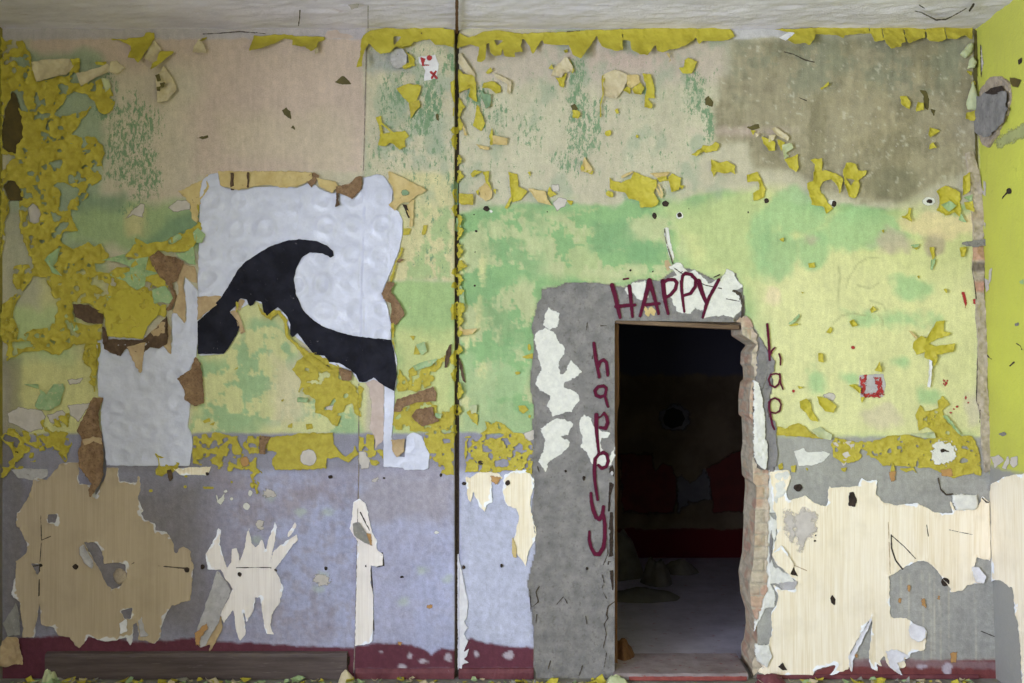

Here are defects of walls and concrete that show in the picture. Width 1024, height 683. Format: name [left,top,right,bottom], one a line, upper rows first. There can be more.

peeling [0,28,735,510]
flaking render [457,227,982,683]
spalling [776,27,1012,222]